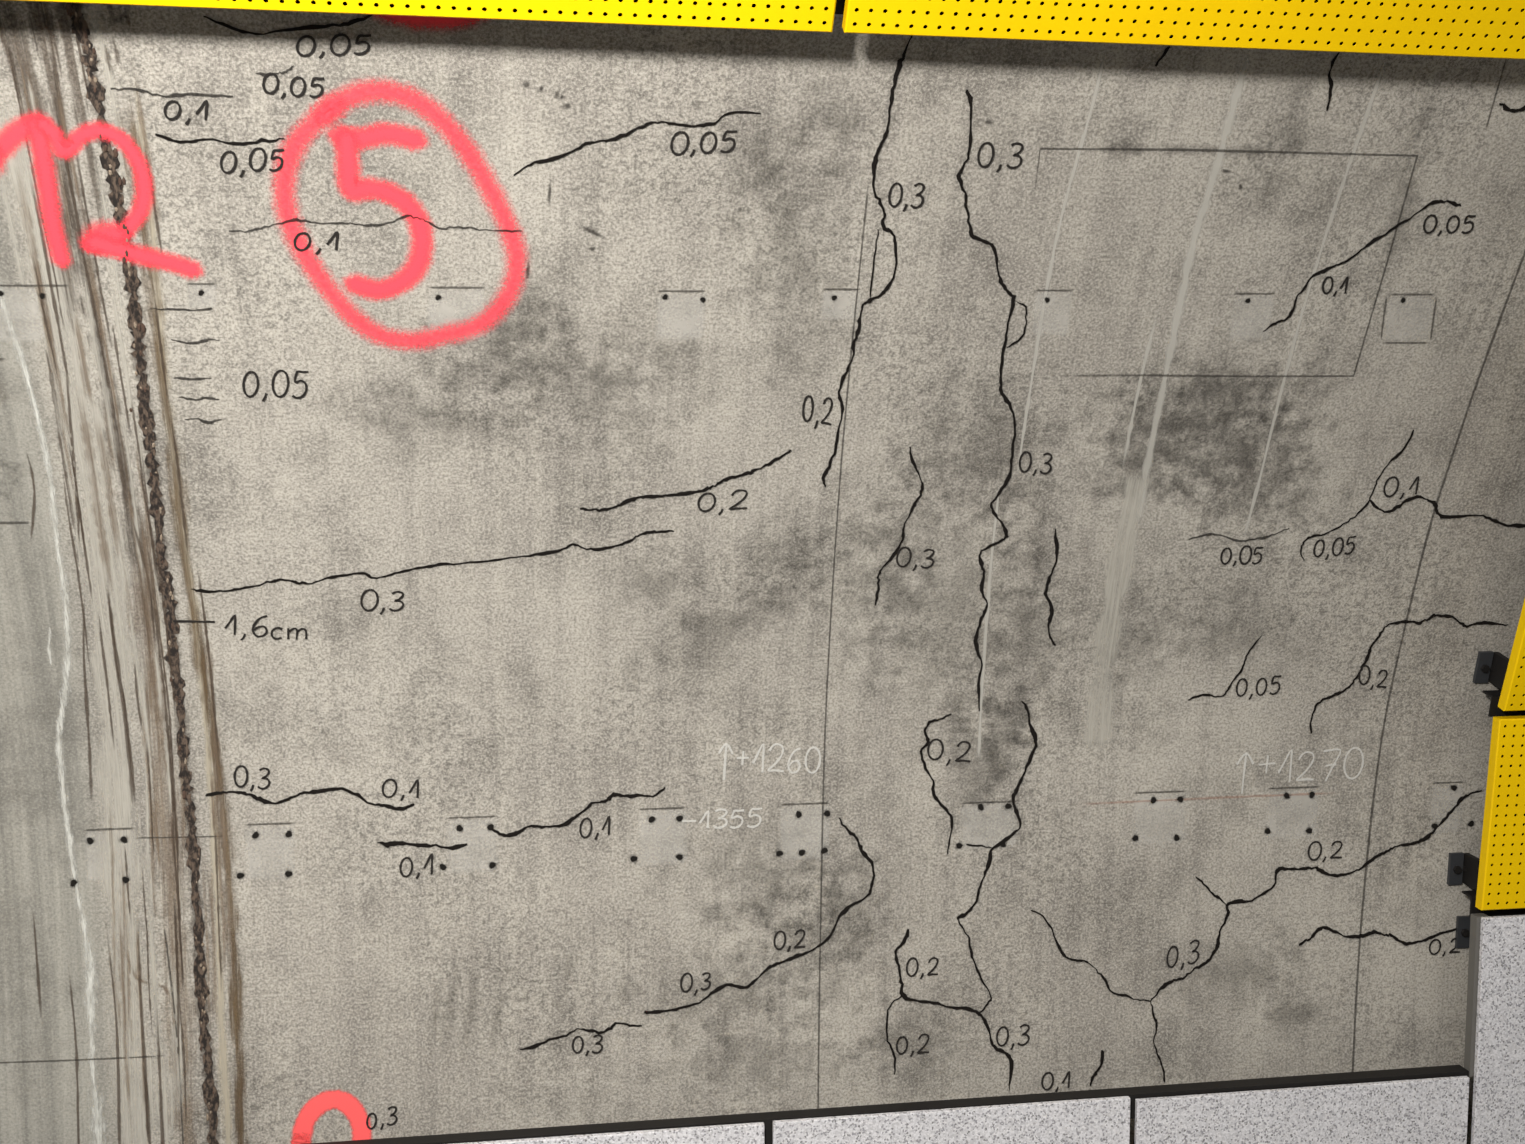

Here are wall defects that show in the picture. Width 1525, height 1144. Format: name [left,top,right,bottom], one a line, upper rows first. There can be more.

crack [1499,103,1525,113]
crack [821,35,913,487]
crack [1263,199,1461,332]
crack [65,3,792,1144]
crack [874,447,924,606]
crack [886,90,1038,1091]
crack [1043,529,1059,646]
crack [1189,430,1525,560]
crack [1309,613,1508,734]
crack [520,818,875,1050]
crack [1031,790,1482,1086]